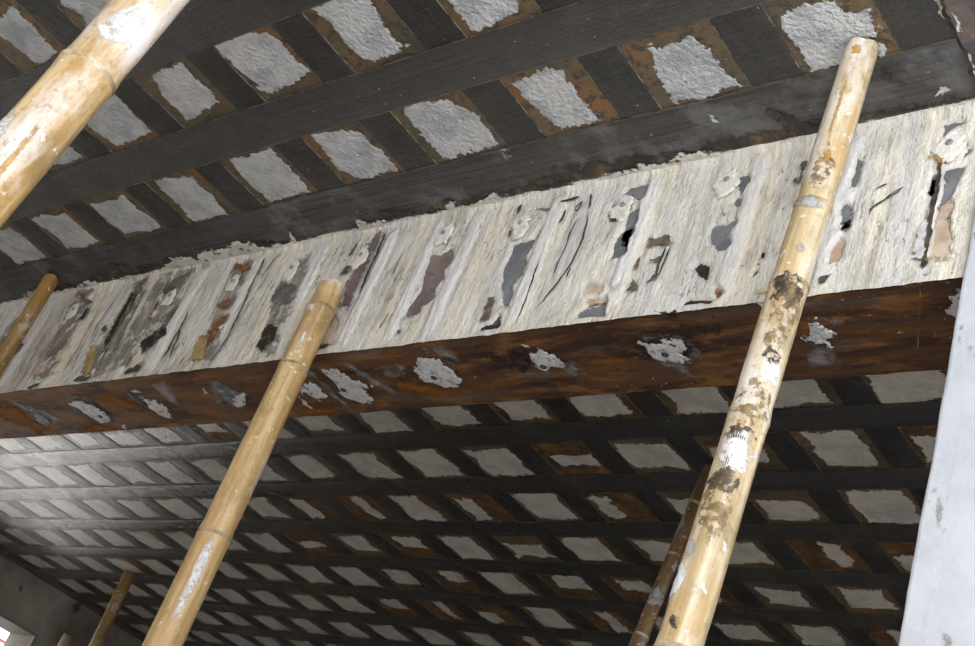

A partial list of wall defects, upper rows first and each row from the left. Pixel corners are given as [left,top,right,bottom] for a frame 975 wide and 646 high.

flaking render [74,266,196,382]
flaking render [189,258,265,361]
flaking render [255,253,312,360]
flaking render [319,230,381,349]
flaking render [406,248,454,318]
flaking render [480,230,540,331]
flaking render [578,234,675,318]
flaking render [609,184,649,259]
flaking render [695,264,710,280]
flaking render [711,221,737,251]
flaking render [818,204,853,283]
flaking render [912,143,971,261]